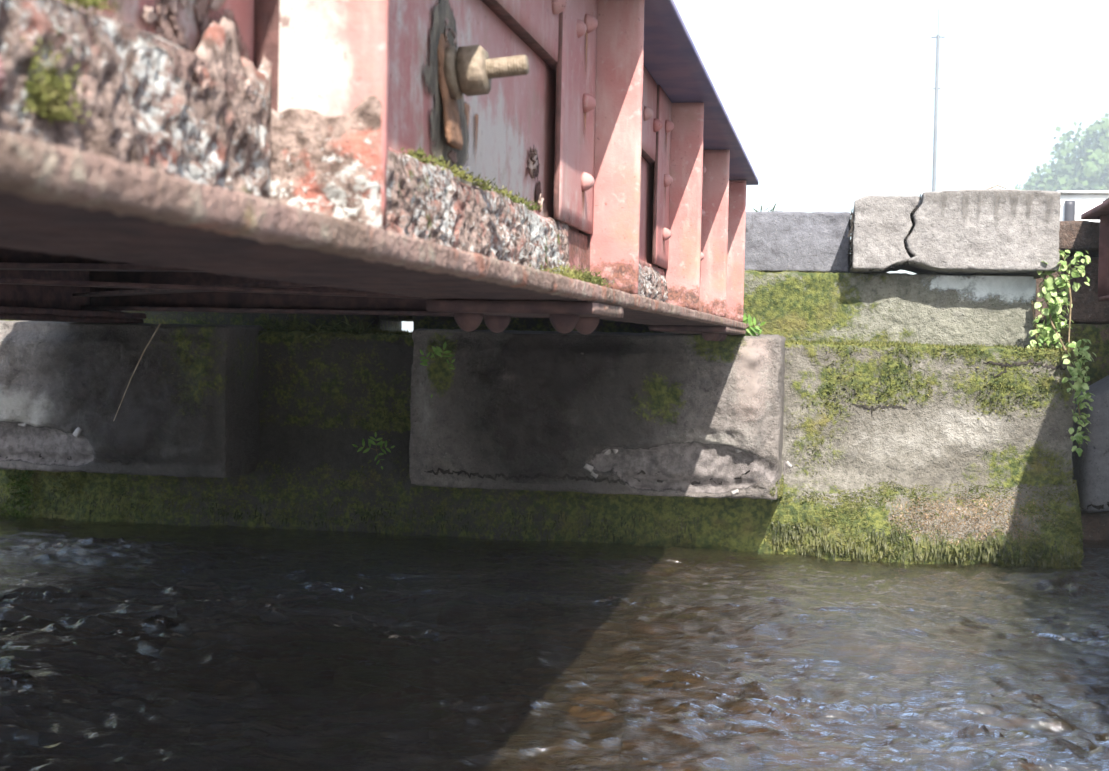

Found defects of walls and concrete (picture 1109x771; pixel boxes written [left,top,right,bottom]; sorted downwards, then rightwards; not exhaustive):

peeling [95,0,250,97]
peeling [223,68,259,103]
crack [847,194,921,271]
crack [424,468,664,485]
spalling [584,441,792,495]
crack [691,470,764,489]